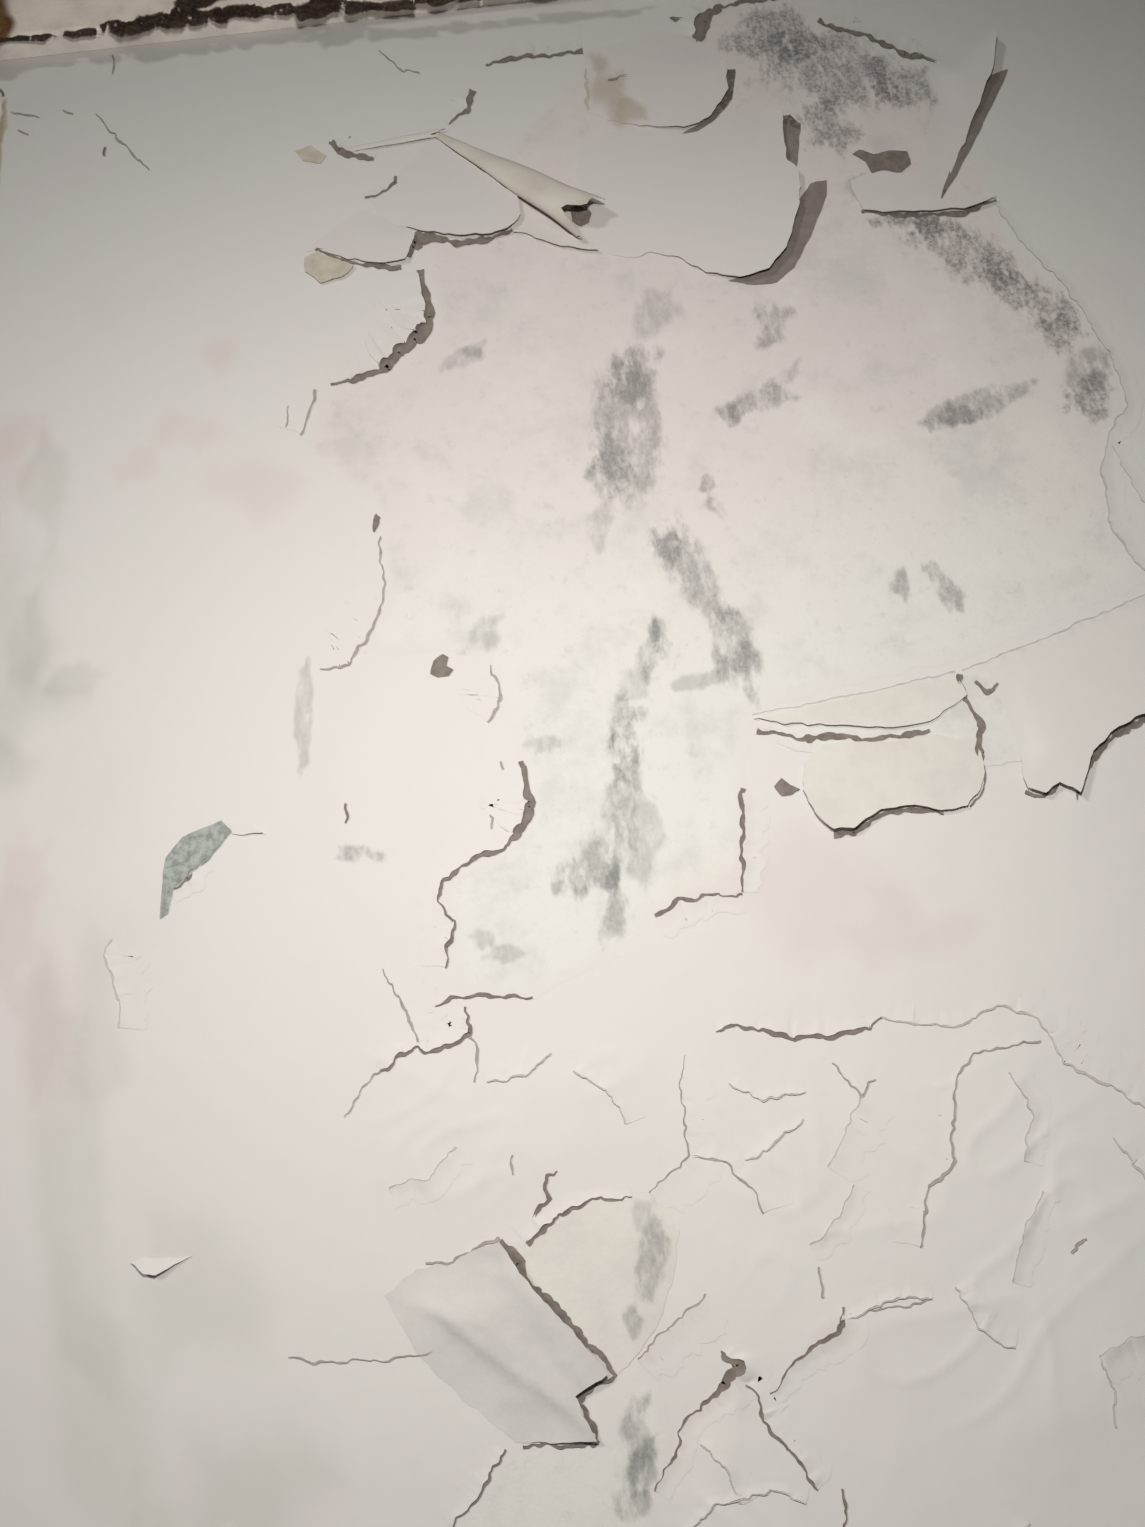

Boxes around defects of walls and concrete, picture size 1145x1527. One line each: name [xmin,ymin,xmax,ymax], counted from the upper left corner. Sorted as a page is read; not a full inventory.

rust [0,0,12,44]
spalling [296,145,326,163]
peeling [301,0,1145,1000]
crack [756,729,931,743]
crack [834,674,999,838]
crack [1025,714,1145,800]
spalling [160,820,263,919]
crack [344,761,536,1117]
crack [654,788,770,938]
crack [426,973,1145,1527]
crack [288,1350,434,1365]
peeling [385,1196,679,1527]